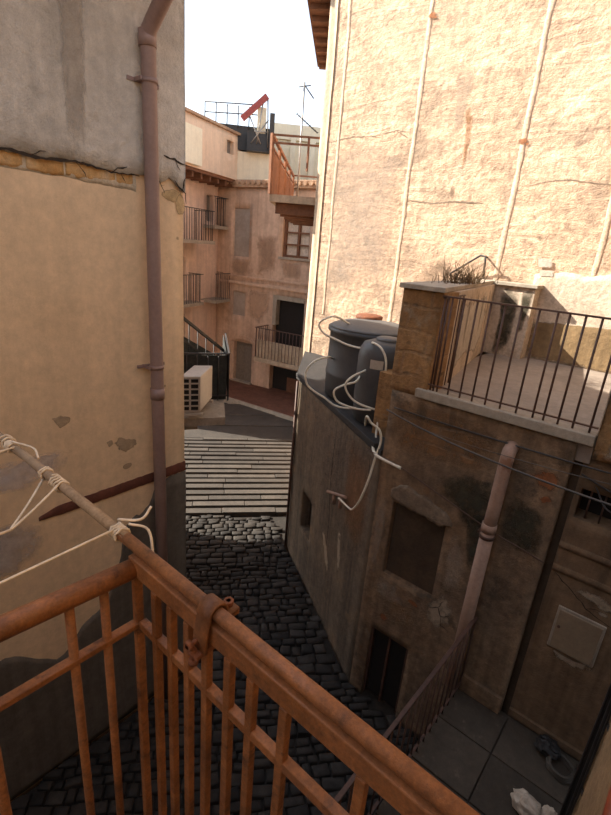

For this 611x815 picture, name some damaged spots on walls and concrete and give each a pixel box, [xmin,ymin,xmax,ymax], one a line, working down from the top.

crack [333,130,409,142]
spalling [0,150,136,192]
crack [522,179,611,187]
crack [411,198,480,206]
damp [493,295,611,372]
peeling [107,438,136,452]
damp [444,478,491,565]